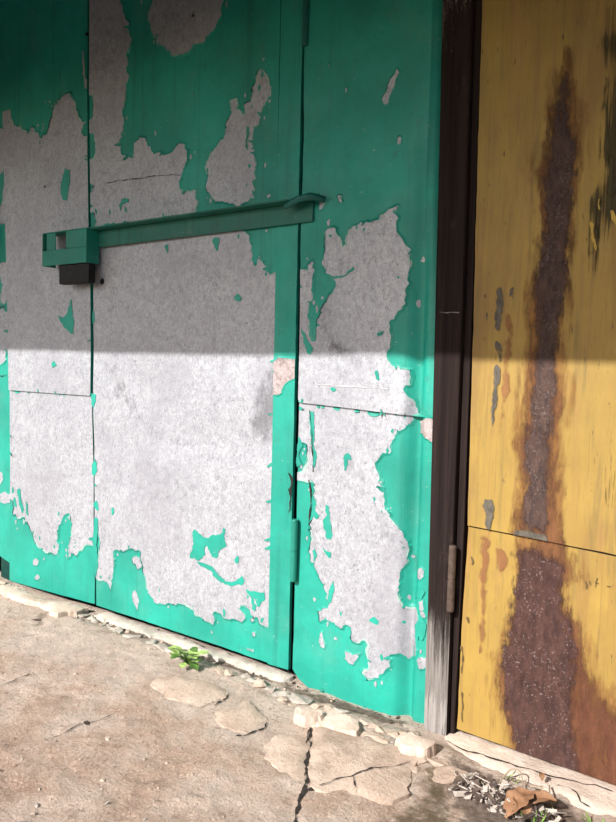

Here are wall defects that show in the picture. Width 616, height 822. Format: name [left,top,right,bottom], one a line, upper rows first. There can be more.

peeling [0,0,433,687]
peeling [491,341,502,426]
peeling [486,287,514,331]
corrosion [495,48,616,785]
peeling [483,499,494,530]
peeling [513,530,548,541]
corrosion [479,537,507,653]
crack [294,727,411,822]